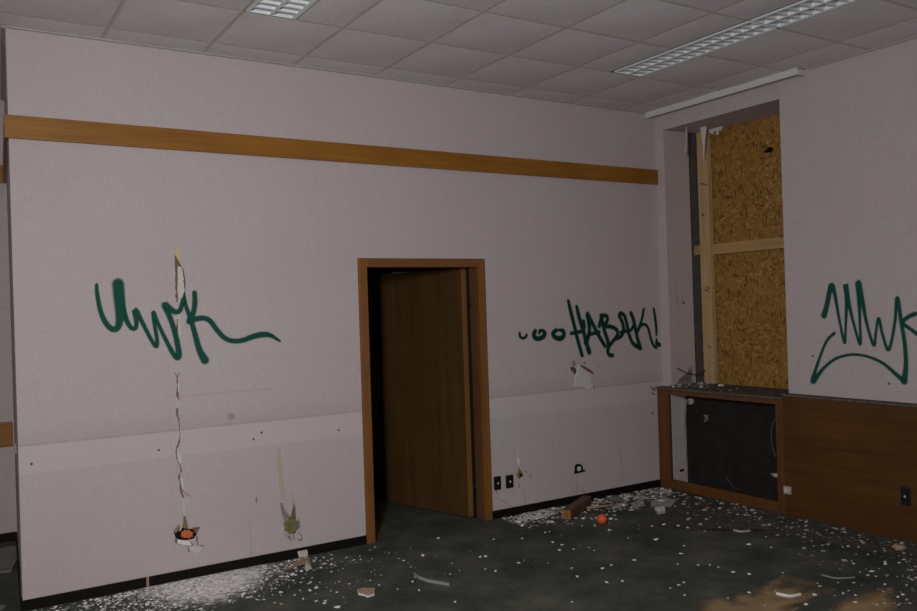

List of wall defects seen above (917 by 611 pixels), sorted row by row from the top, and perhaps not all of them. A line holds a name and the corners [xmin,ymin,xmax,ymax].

crack [174,373,191,521]
spalling [174,516,204,554]
spalling [280,502,302,541]